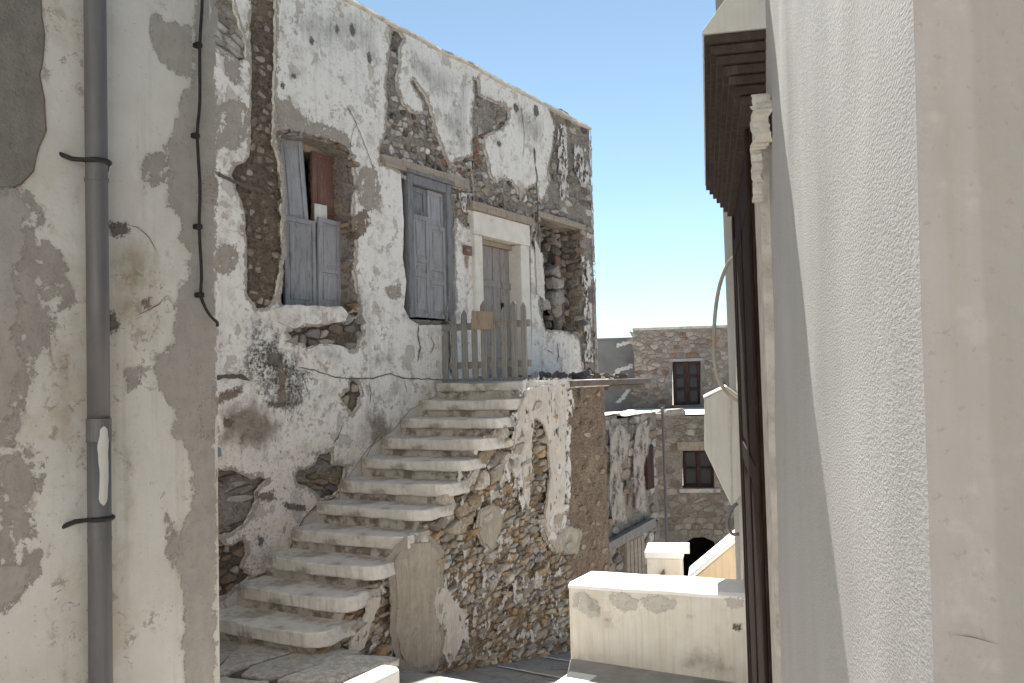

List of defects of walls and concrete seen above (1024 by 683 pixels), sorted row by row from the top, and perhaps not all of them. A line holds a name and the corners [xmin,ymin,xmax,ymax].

peeling [0,0,78,615]
peeling [122,0,599,683]
crack [299,320,452,405]